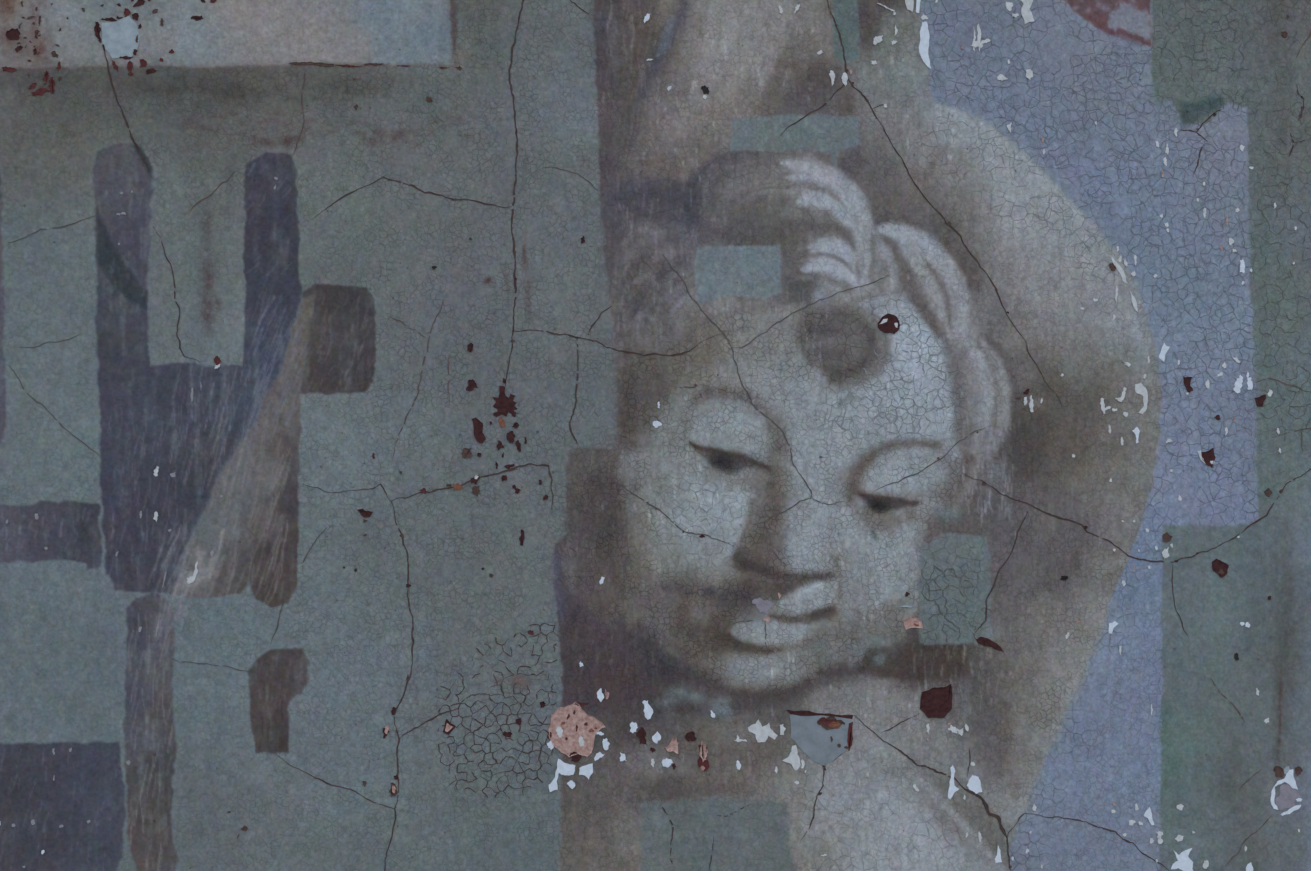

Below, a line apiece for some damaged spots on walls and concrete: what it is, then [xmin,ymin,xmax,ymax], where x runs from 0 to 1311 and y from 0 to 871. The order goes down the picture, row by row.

crack [1180,109,1222,175]
crack [780,0,1062,406]
crack [154,228,198,361]
peeling [1100,343,1273,445]
crack [875,428,1311,636]
crack [276,463,553,871]
peeling [540,688,627,792]
peeling [630,700,709,771]
peeling [734,710,853,785]
peeling [920,684,969,742]
crack [801,713,1169,871]
peeling [1122,803,1209,871]